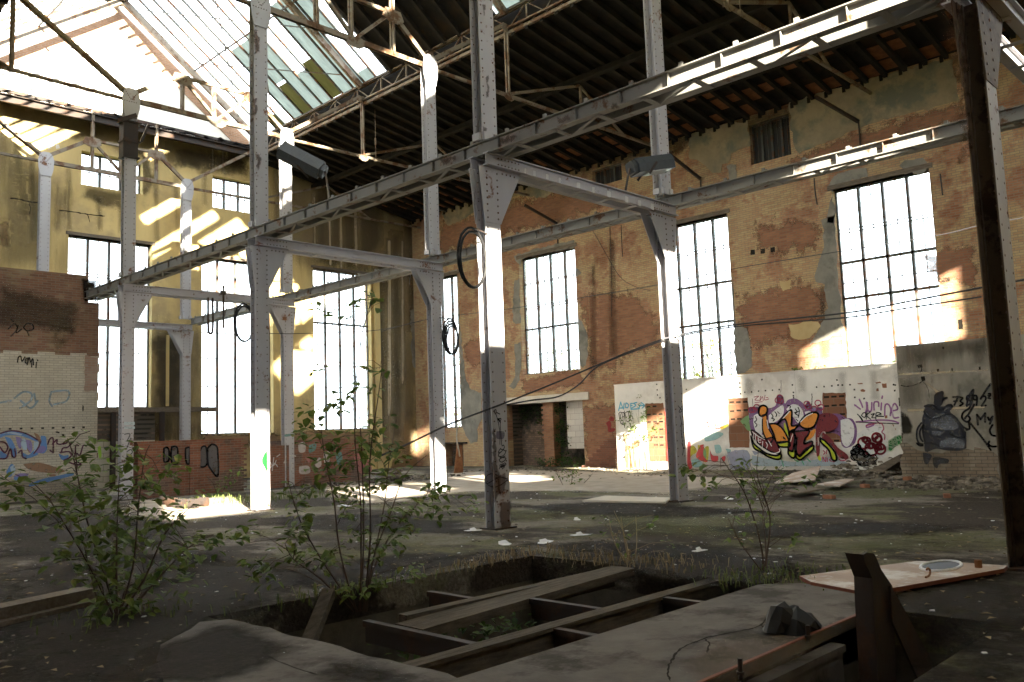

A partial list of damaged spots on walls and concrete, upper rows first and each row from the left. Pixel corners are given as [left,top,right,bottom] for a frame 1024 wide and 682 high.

flaking render [688,121,751,180]
flaking render [899,158,928,174]
spalling [732,168,868,374]
corrosion [492,430,511,528]